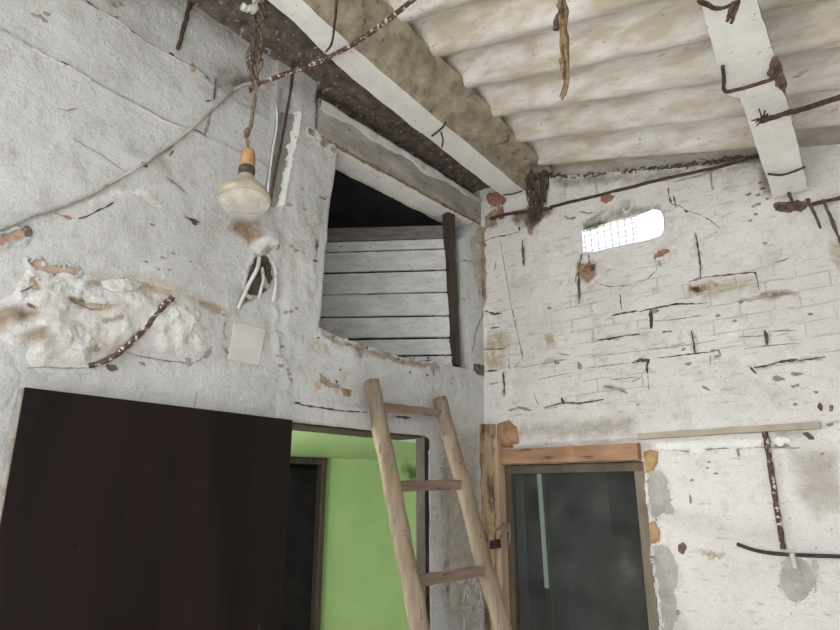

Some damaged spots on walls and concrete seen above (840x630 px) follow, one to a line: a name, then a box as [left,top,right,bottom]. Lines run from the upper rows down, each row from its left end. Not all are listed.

spalling [0,225,83,285]
spalling [649,246,673,262]
crack [667,171,760,290]
crack [472,226,826,411]
spalling [644,467,677,522]
spalling [650,540,687,630]
spalling [775,556,820,606]